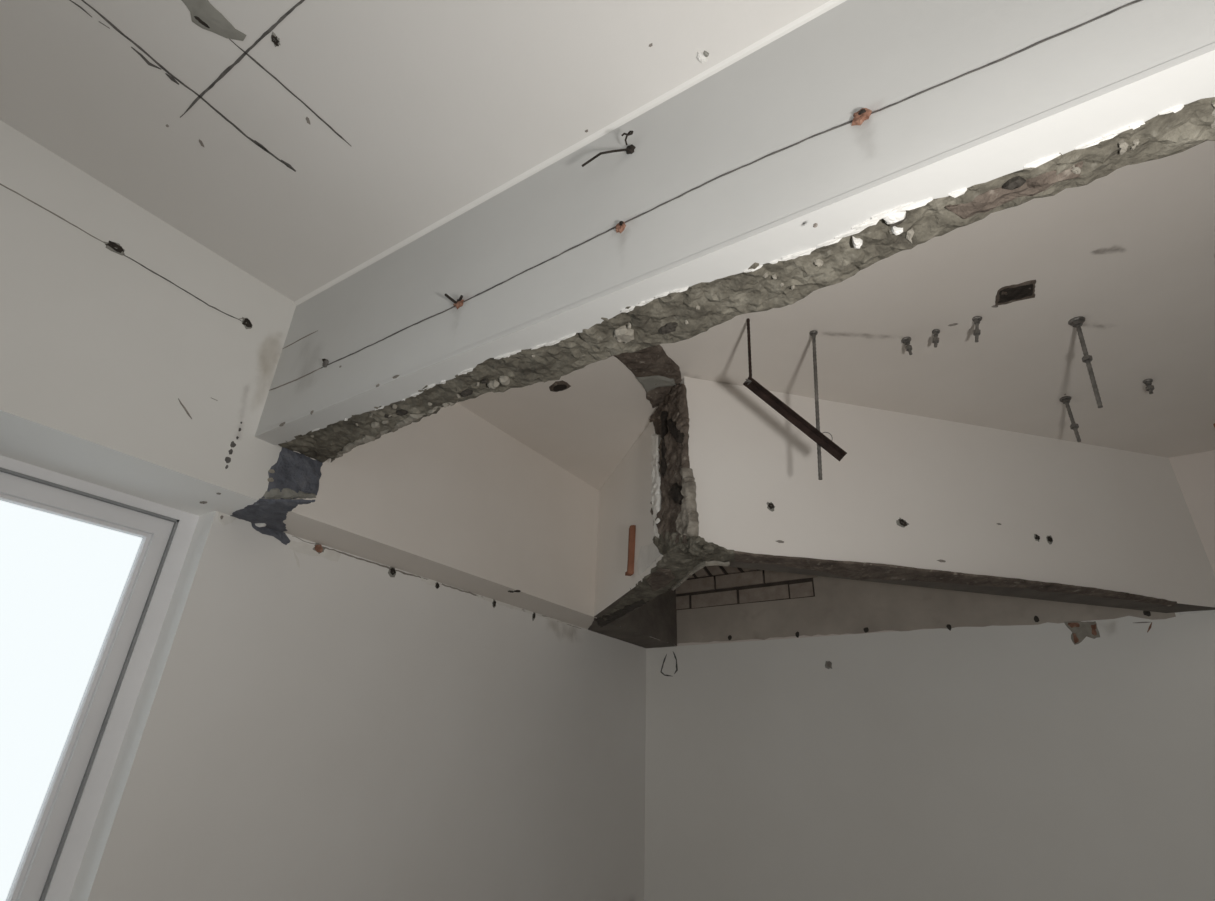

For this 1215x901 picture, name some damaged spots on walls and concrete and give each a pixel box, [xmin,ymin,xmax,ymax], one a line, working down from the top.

spalling [278,97,1215,463]
peeling [588,384,1203,648]